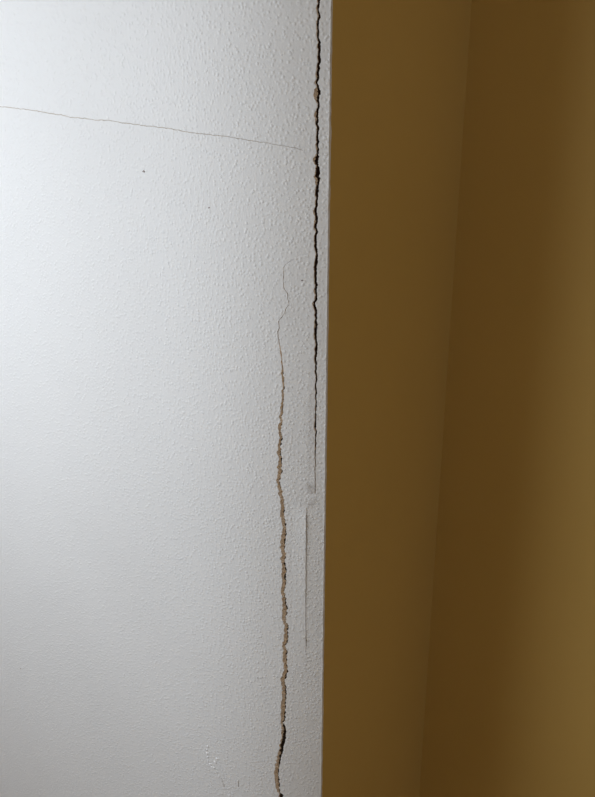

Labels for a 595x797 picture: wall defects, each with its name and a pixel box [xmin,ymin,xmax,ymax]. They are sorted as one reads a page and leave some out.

crack [0,0,321,797]